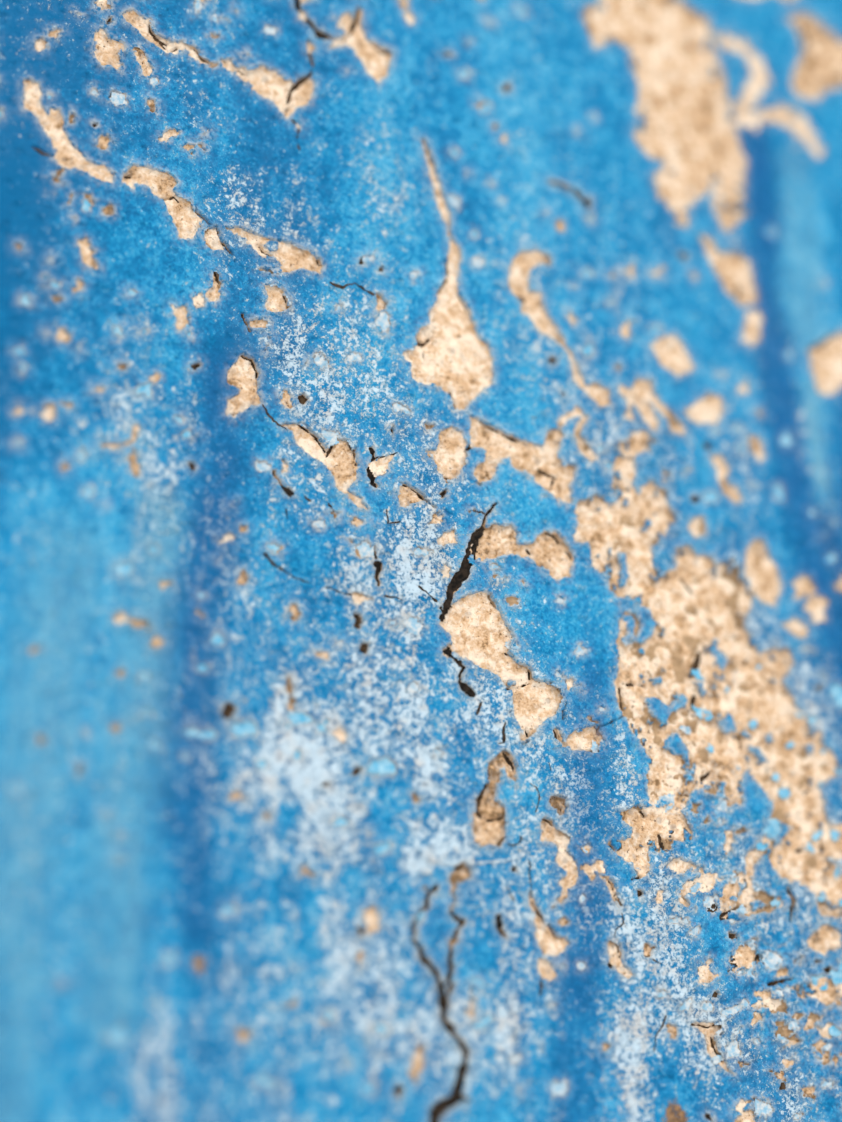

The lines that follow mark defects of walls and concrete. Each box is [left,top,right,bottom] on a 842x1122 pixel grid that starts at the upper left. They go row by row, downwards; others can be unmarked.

peeling [34,30,60,52]
peeling [93,0,396,128]
peeling [582,0,842,231]
peeling [23,80,322,332]
crack [263,552,352,596]
crack [373,503,497,715]
peeling [279,140,842,1090]
crack [498,722,506,744]
crack [495,836,532,938]
crack [410,884,473,1122]
peeling [393,1046,424,1098]
peeling [735,1099,756,1122]